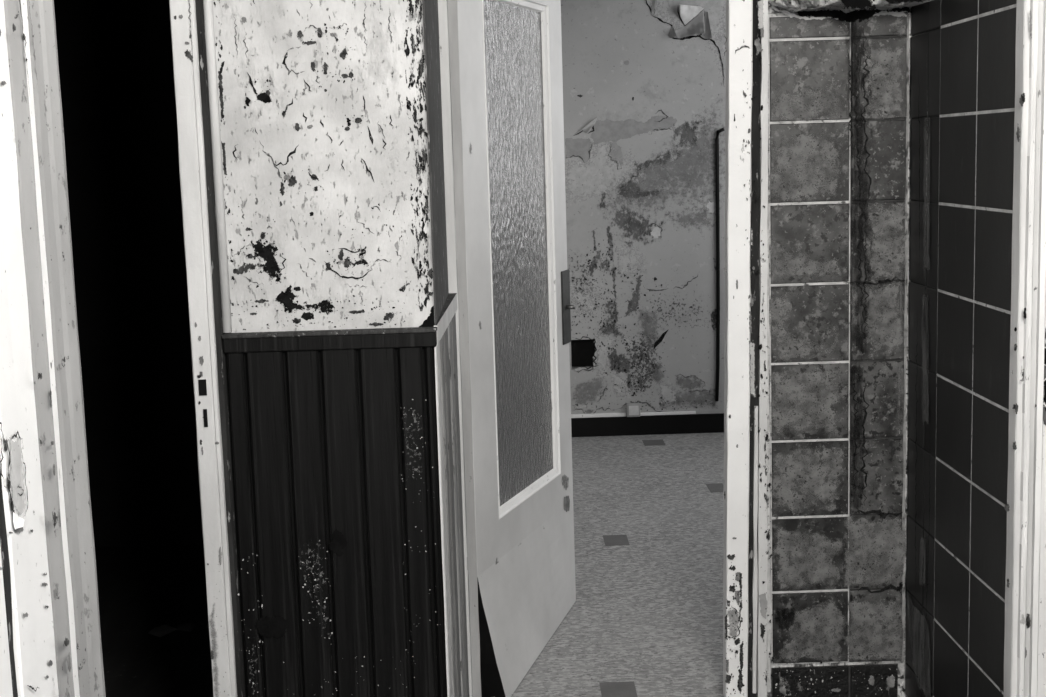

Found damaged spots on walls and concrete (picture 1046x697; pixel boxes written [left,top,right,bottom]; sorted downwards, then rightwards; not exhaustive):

peeling [215,41,225,125]
spalling [244,74,272,109]
peeling [297,23,355,92]
spalling [723,0,930,68]
spalling [283,169,324,194]
peeling [399,0,435,327]
spalling [227,232,405,328]
leakage [569,114,725,414]
peeling [745,230,773,570]
crack [845,20,931,681]
peeling [725,554,745,697]
peeling [759,581,844,697]